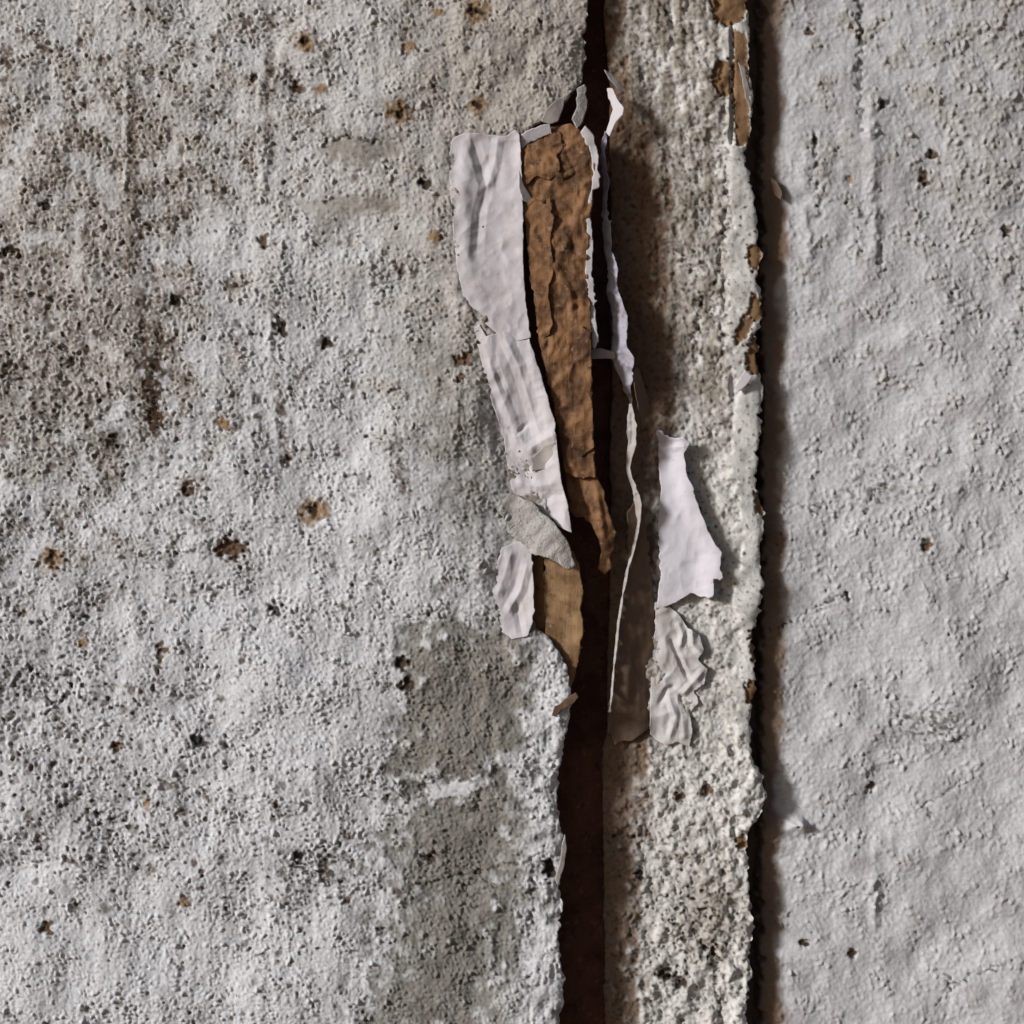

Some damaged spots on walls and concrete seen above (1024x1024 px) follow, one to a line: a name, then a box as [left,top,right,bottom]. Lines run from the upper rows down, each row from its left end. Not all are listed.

spalling [572,84,588,128]
spalling [709,0,750,146]
spalling [745,245,762,273]
hole [452,352,472,383]
spalling [733,293,762,376]
peeling [500,493,576,570]